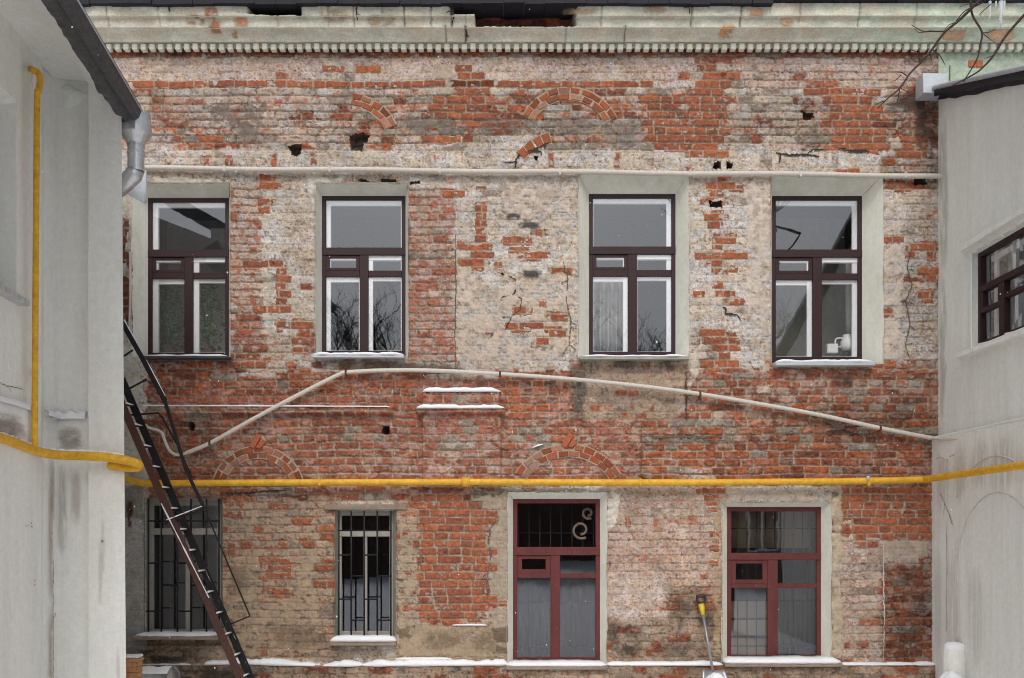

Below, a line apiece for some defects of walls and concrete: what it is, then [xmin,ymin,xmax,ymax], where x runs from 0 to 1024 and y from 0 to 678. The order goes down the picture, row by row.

crack [505,142,549,168]
crack [776,147,869,163]
spalling [803,88,928,160]
spalling [126,63,771,340]
flaking render [442,178,575,369]
crack [500,276,522,329]
crack [561,262,576,356]
crack [899,250,916,358]
spalling [241,357,271,368]
spalling [687,329,743,390]
flaking render [754,383,773,394]
spalling [396,485,631,660]